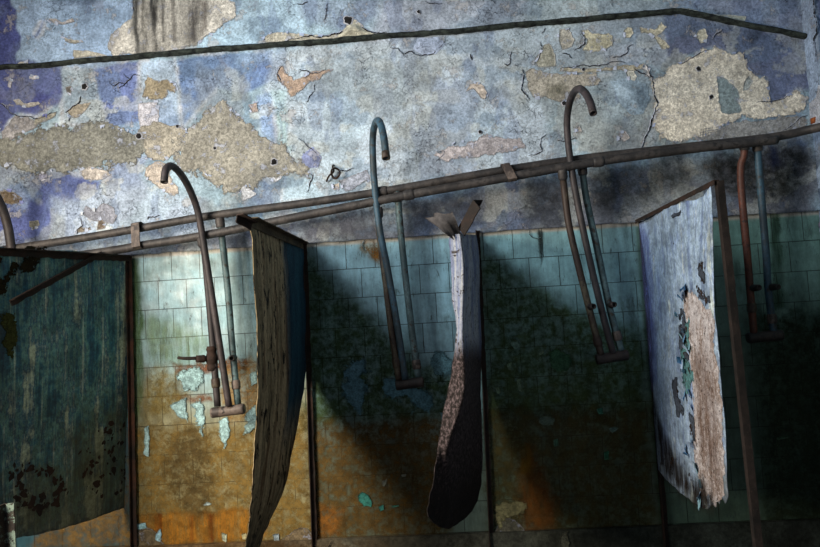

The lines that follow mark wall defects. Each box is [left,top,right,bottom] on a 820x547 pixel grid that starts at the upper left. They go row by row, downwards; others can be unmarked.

peeling [60,0,236,59]
crack [287,2,446,56]
crack [505,28,546,101]
crack [562,31,659,148]
peeling [525,28,820,144]
crack [811,0,819,62]
peeling [0,75,311,201]
rust [9,462,69,516]
rust [78,359,257,545]
peeling [170,366,205,436]
peeling [218,417,230,448]
rust [262,411,337,541]